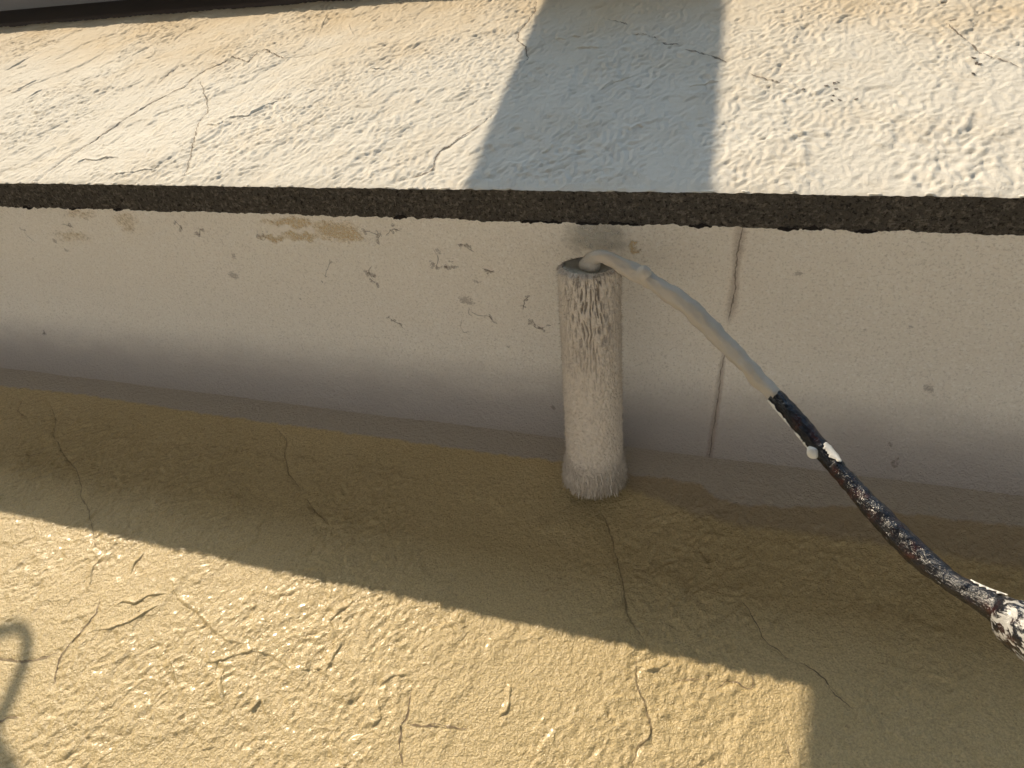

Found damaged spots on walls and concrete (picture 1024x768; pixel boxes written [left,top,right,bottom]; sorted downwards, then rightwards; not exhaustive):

crack [615,20,726,62]
crack [939,0,1018,69]
crack [48,47,328,175]
crack [396,118,488,183]
crack [0,600,100,684]
crack [395,694,467,765]
crack [629,664,652,764]